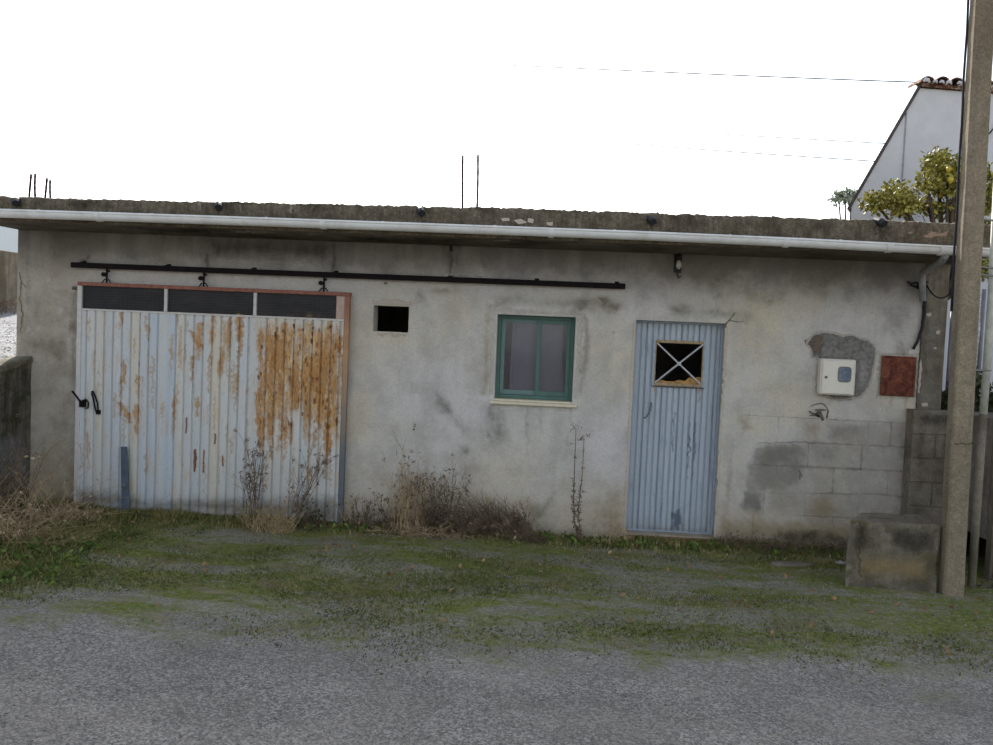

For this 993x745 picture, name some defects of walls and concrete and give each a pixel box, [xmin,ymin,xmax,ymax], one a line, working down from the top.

corrosion [191,316,214,369]
corrosion [218,313,244,374]
corrosion [255,322,342,458]
spalling [805,331,877,401]